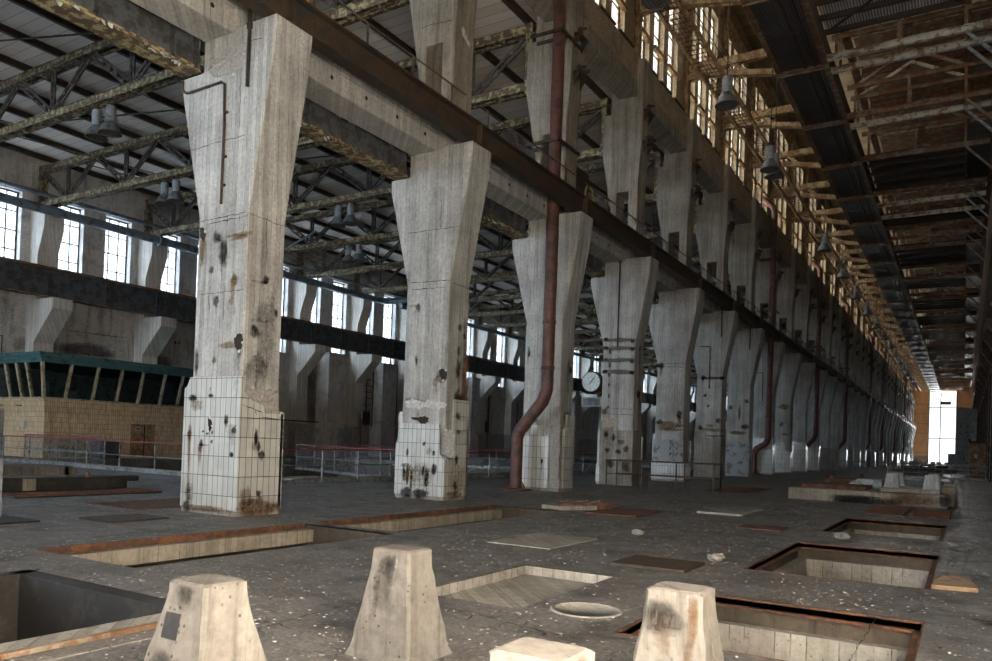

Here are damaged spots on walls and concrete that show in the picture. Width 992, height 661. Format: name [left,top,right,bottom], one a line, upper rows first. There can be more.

spalling [234,332,243,353]